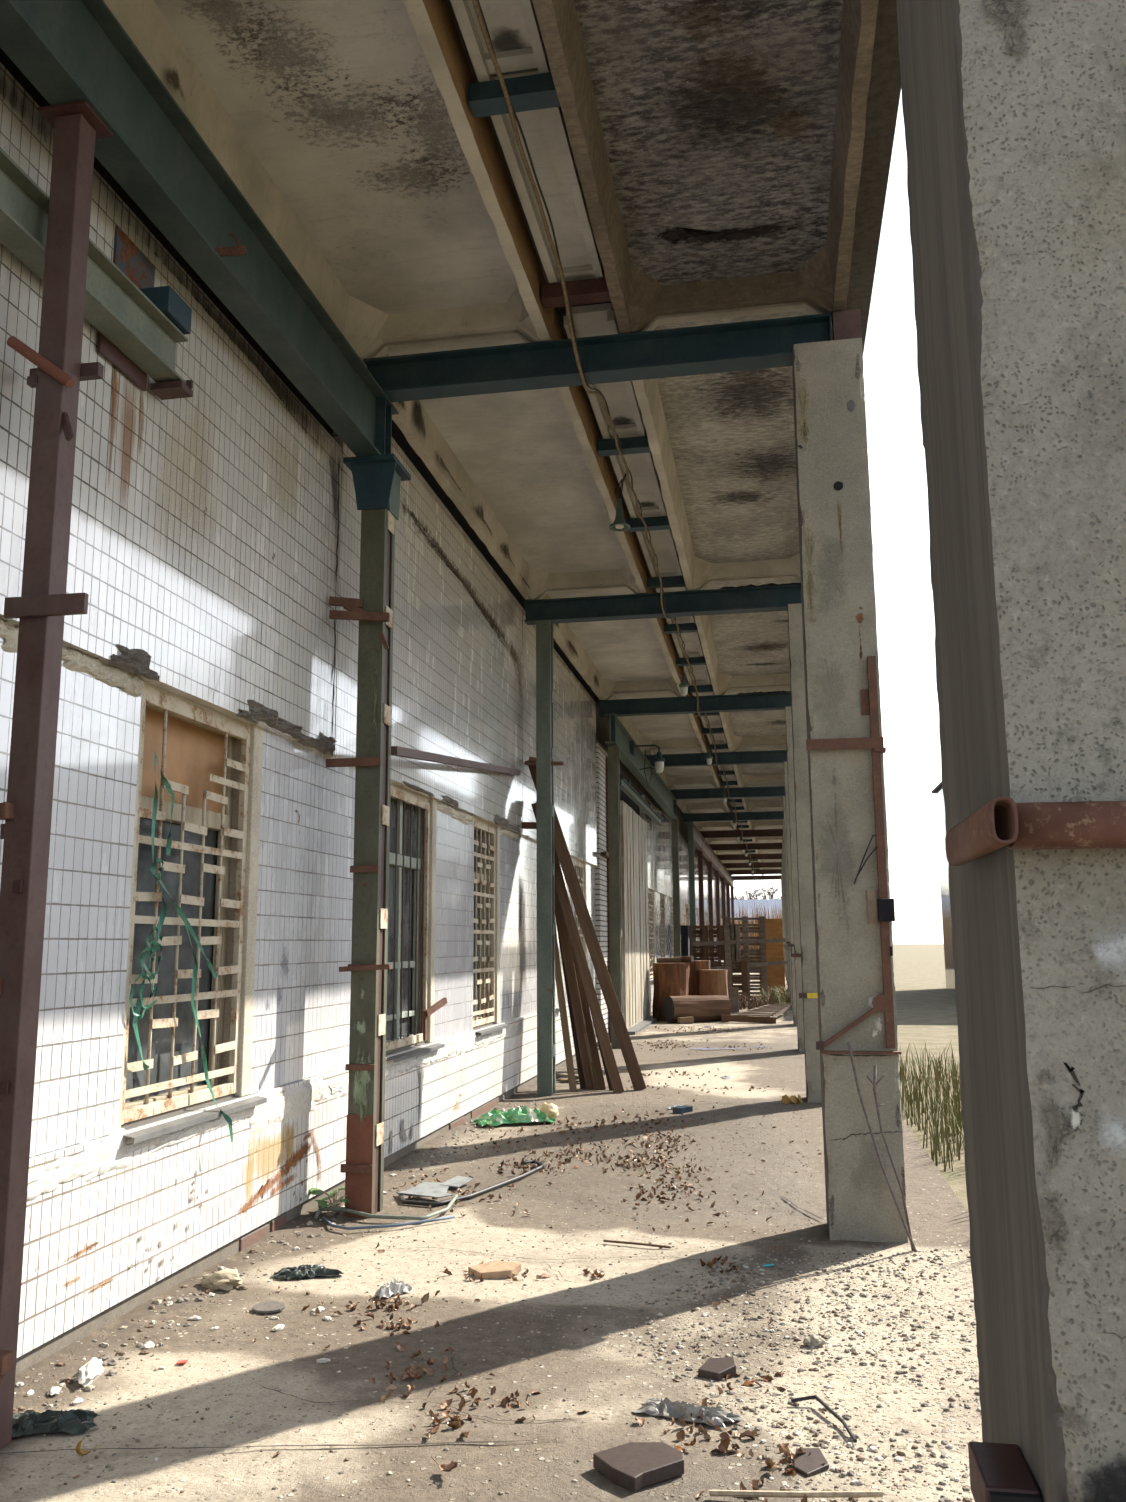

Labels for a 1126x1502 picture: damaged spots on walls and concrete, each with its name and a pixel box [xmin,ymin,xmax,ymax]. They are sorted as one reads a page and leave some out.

damp [168,71,183,96]
flaking render [62,644,160,697]
spalling [236,699,337,756]
corrosion [240,1130,321,1213]